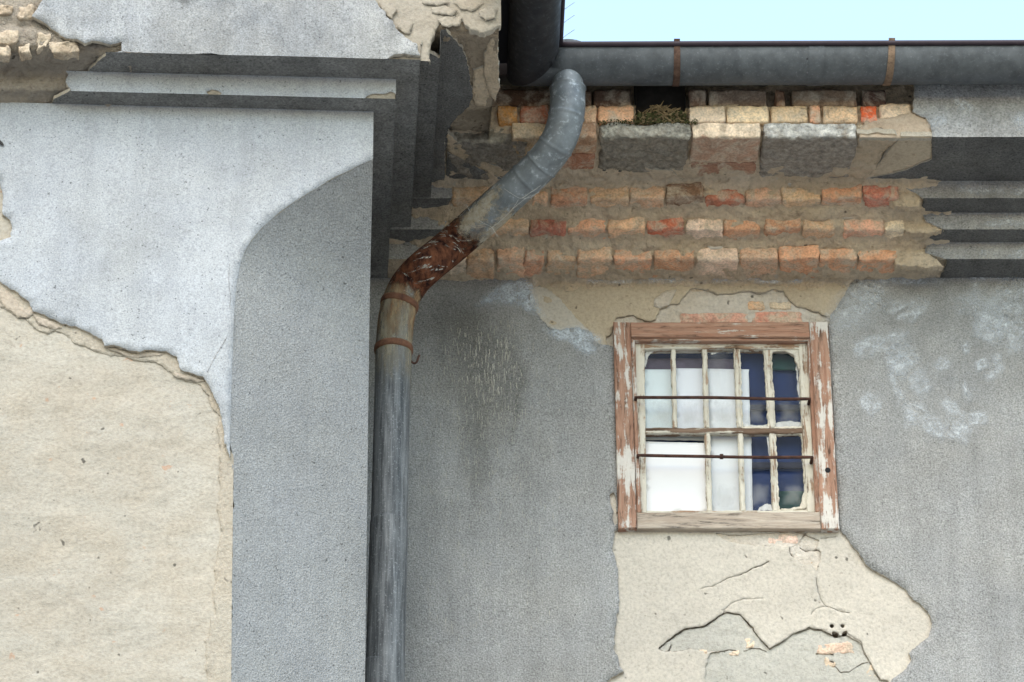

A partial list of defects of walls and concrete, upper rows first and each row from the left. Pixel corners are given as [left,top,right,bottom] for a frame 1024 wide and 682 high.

spalling [0,0,122,103]
spalling [375,0,550,247]
spalling [439,85,951,346]
spalling [0,283,234,682]
damp [419,280,599,644]
crack [659,612,879,679]
spalling [609,494,932,682]
damp [907,401,985,438]